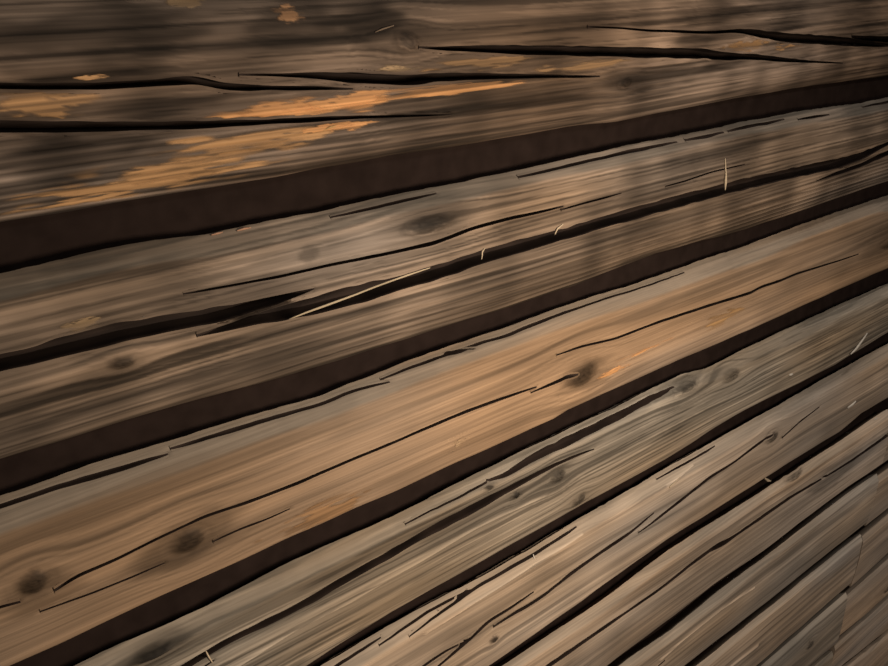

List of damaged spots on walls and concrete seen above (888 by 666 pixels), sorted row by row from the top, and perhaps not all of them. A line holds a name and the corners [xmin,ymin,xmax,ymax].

crack [0,24,888,137]
crack [0,141,888,375]
crack [516,112,831,180]
crack [178,384,676,666]
crack [0,252,859,614]
crack [420,405,888,666]